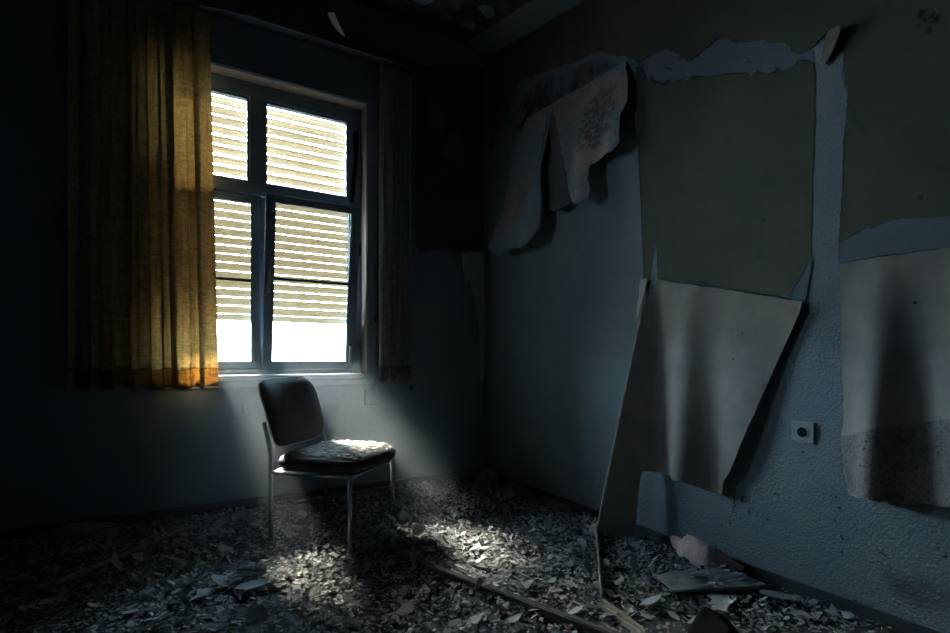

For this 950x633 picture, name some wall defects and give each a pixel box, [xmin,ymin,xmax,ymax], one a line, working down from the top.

flaking render [637,37,814,85]
peeling [488,109,572,255]
flaking render [838,217,950,264]